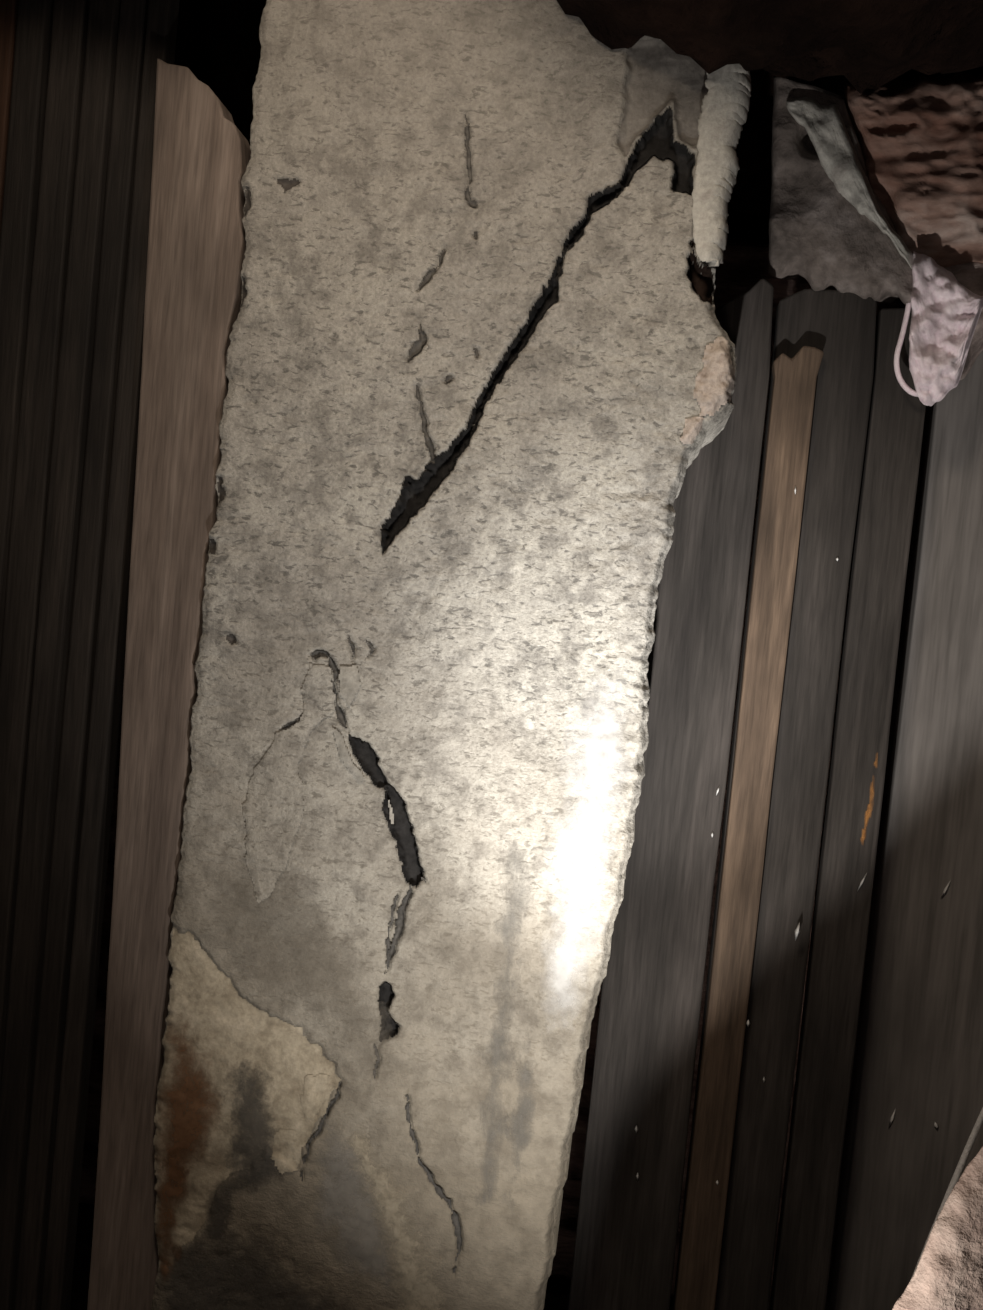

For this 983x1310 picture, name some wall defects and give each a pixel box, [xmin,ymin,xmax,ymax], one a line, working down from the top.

crack [380,106,695,554]
crack [687,240,714,305]
peeling [894,251,983,406]
crack [281,716,302,730]
crack [310,637,426,1079]
peeling [154,926,341,1266]
crack [300,1083,341,1181]
peeling [352,1135,445,1310]
crack [405,1095,462,1273]